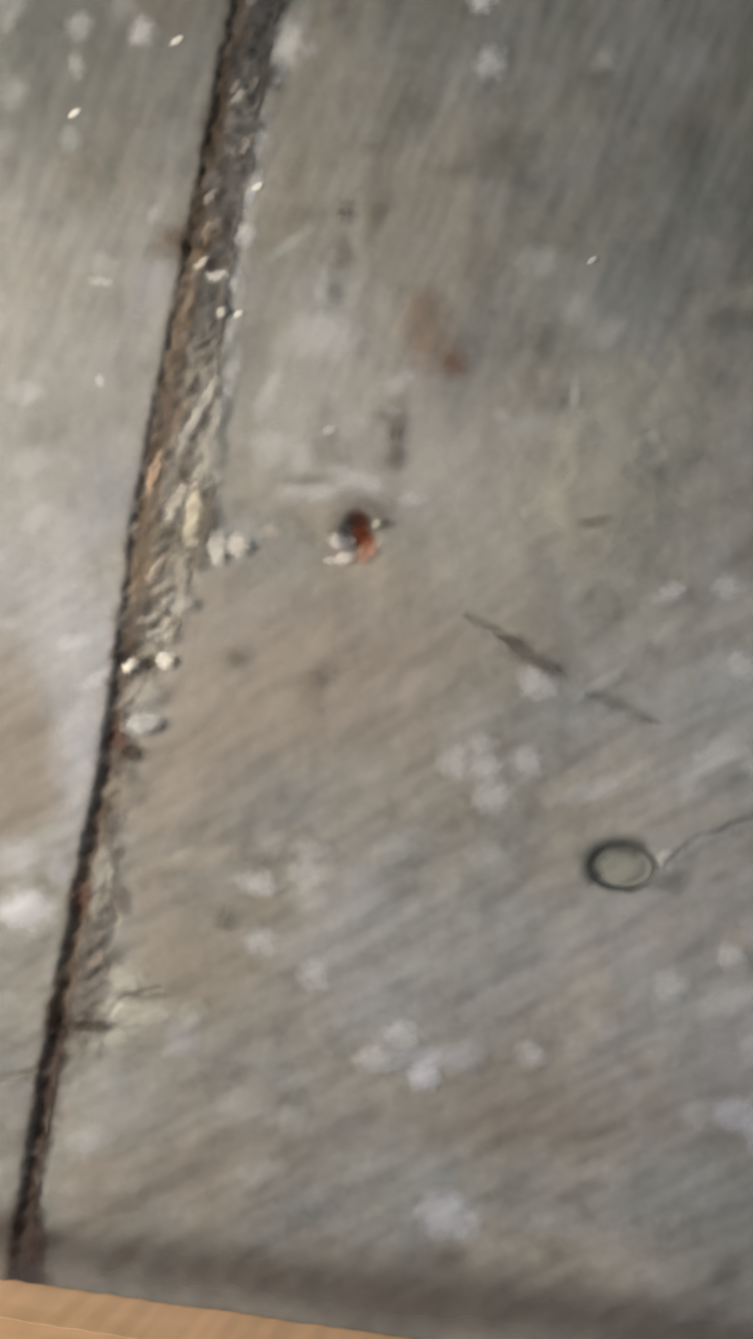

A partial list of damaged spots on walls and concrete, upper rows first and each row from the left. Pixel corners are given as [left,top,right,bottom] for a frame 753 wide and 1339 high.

crack [5,0,283,1283]
corrosion [333,503,389,562]